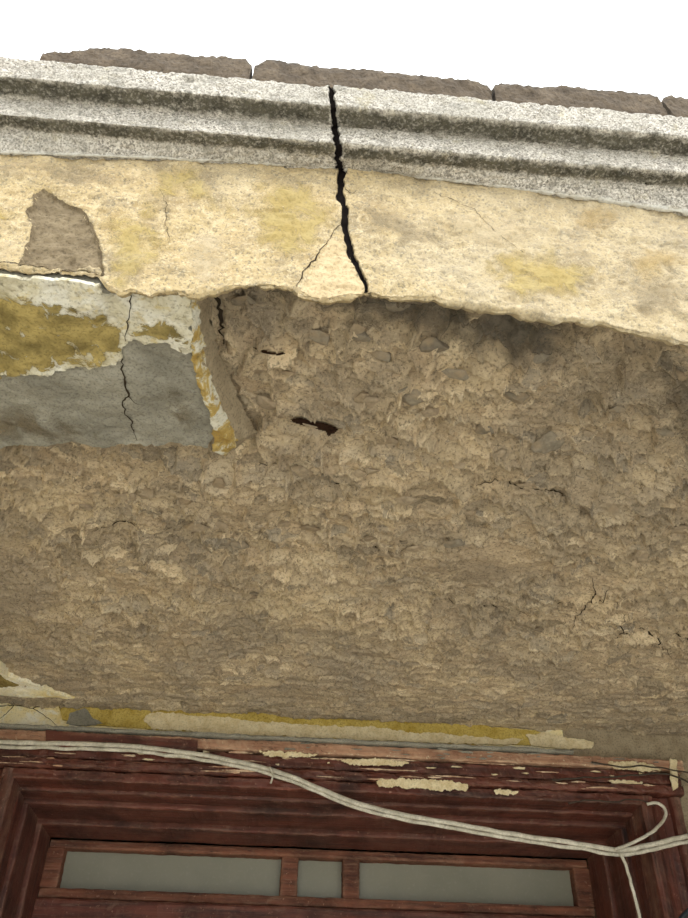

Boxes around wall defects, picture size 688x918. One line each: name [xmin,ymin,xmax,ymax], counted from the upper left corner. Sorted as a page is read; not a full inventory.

spalling [18,189,105,276]
crack [297,86,368,293]
crack [120,295,139,440]
crack [214,297,225,344]
spalling [0,287,688,796]